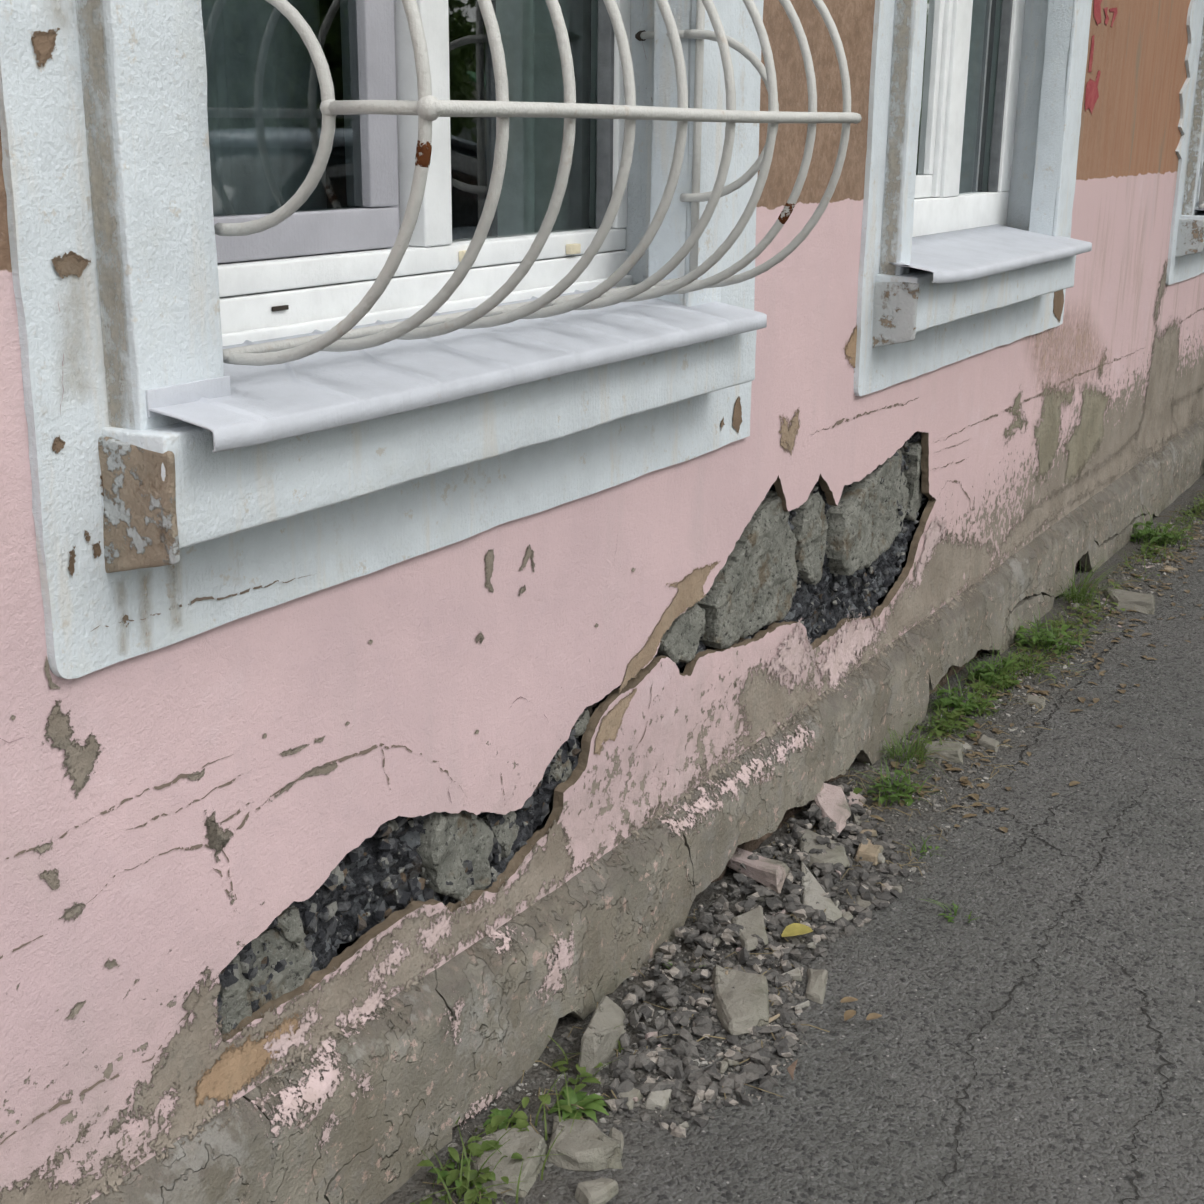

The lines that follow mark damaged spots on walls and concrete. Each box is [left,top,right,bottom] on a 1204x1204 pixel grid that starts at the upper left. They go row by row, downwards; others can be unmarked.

corrosion [415,140,432,168]
corrosion [778,203,795,224]
peeling [51,251,91,279]
crack [813,398,918,435]
crack [73,575,309,634]
flaking render [0,259,1204,1204]
crack [325,743,463,804]
crack [7,756,299,914]
crack [0,920,67,959]
crack [1,1003,198,1144]